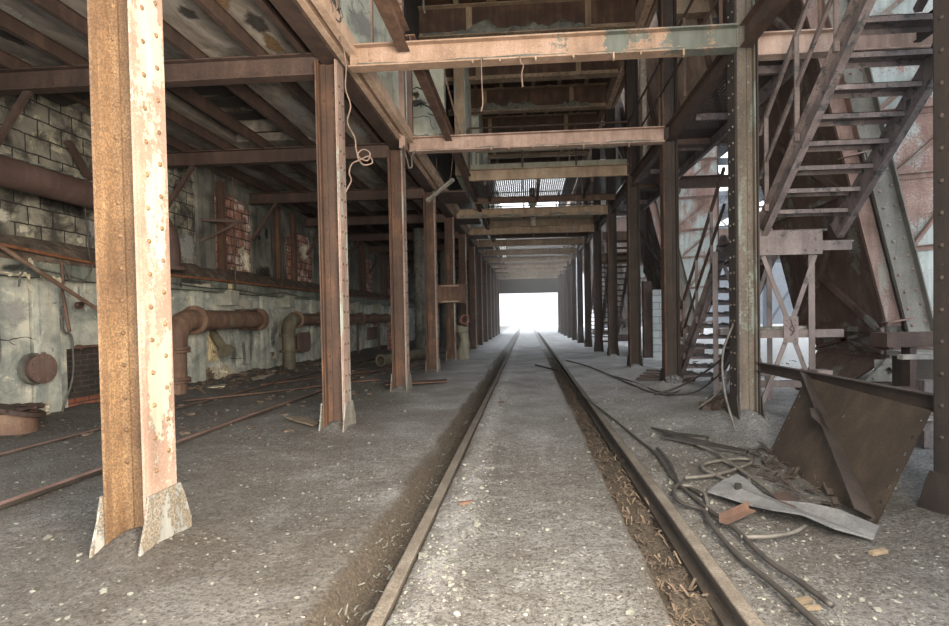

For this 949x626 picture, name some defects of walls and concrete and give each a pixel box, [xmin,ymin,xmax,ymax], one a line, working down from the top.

peeling [231,246,251,272]
peeling [299,243,310,261]